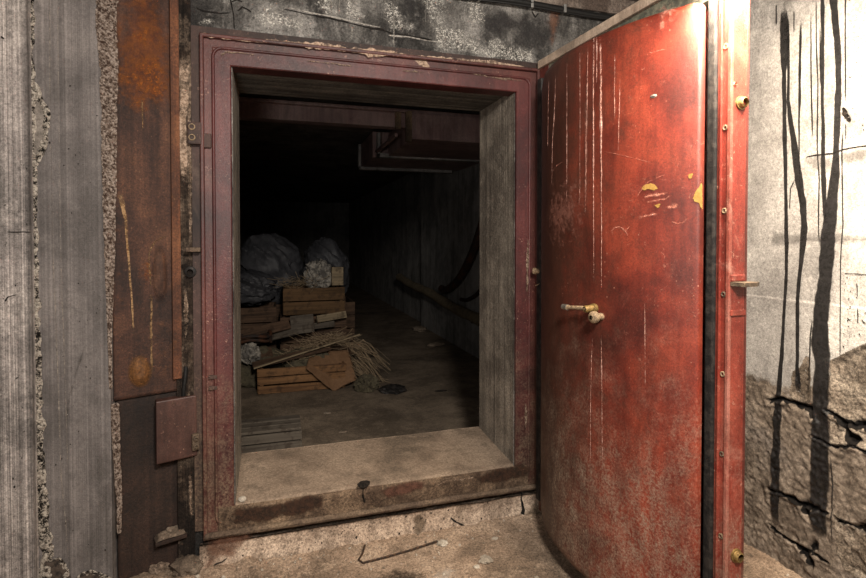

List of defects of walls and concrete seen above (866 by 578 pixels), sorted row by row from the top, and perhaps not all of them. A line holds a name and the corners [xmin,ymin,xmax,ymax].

peeling [284,40,403,57]
peeling [404,55,523,72]
water stain [770,0,846,539]
spalling [789,356,811,405]
spalling [829,277,866,450]
crack [769,398,866,454]
crack [770,489,866,532]
spalling [44,557,111,578]
crack [770,526,829,565]
spalling [833,513,866,578]